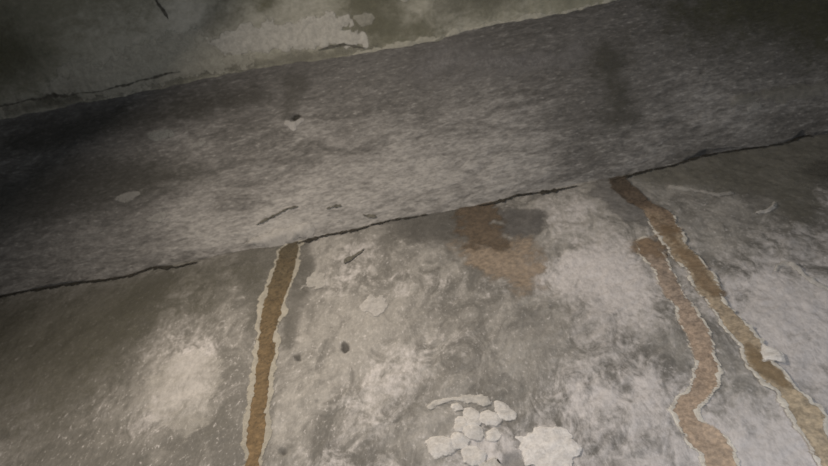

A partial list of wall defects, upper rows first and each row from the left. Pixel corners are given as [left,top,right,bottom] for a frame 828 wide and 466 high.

corrosion [455,202,545,295]